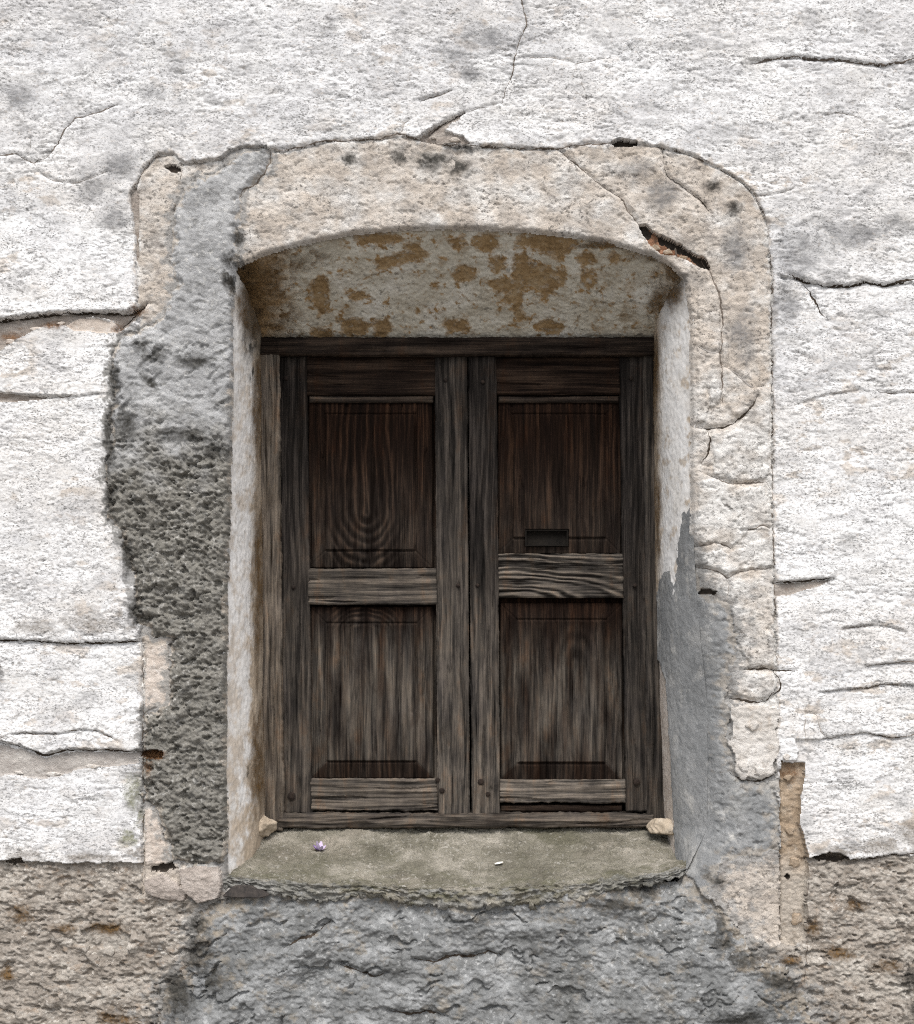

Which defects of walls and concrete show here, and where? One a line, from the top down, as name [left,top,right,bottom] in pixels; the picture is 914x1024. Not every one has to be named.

crack [752,55,914,67]
crack [0,106,112,184]
crack [134,0,639,225]
peeling [358,232,427,269]
peeling [448,234,597,335]
flaking render [639,225,710,269]
crack [656,147,914,333]
flaking render [144,644,171,712]
crack [852,661,914,690]
flaking render [659,663,675,853]
flaking render [145,807,179,872]
flaking render [779,760,849,946]